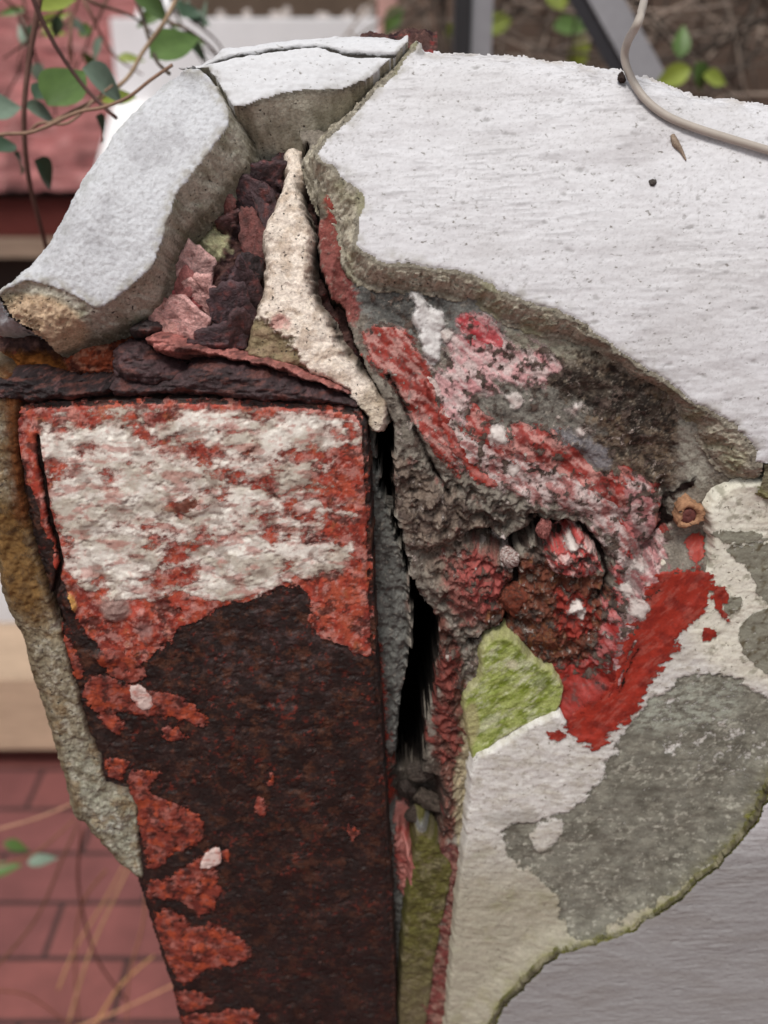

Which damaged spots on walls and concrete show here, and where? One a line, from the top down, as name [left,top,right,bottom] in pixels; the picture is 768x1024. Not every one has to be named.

crack [179,46,396,70]
spalling [195,222,244,287]
spalling [0,326,66,378]
corrosion [0,152,359,622]
crack [310,193,449,769]
spalling [232,27,768,1024]
peeling [0,395,376,878]
peeling [145,847,231,917]
peeling [153,908,259,1024]